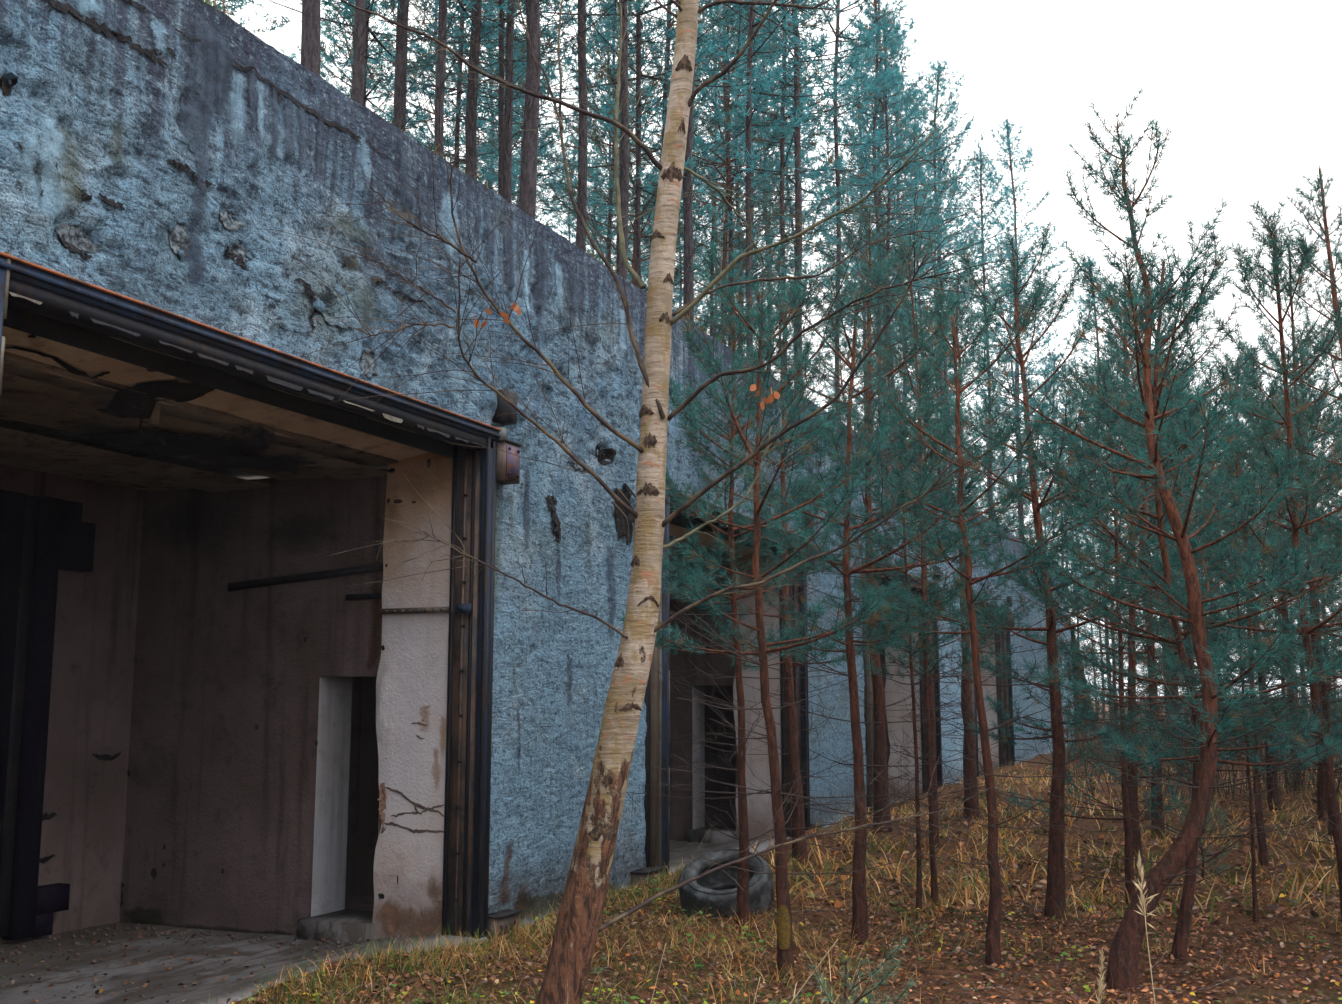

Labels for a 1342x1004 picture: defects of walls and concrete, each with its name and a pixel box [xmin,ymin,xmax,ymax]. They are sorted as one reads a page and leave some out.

leakage [180,23,234,281]
leakage [341,254,358,270]
leakage [486,212,515,296]
crack [381,787,444,834]